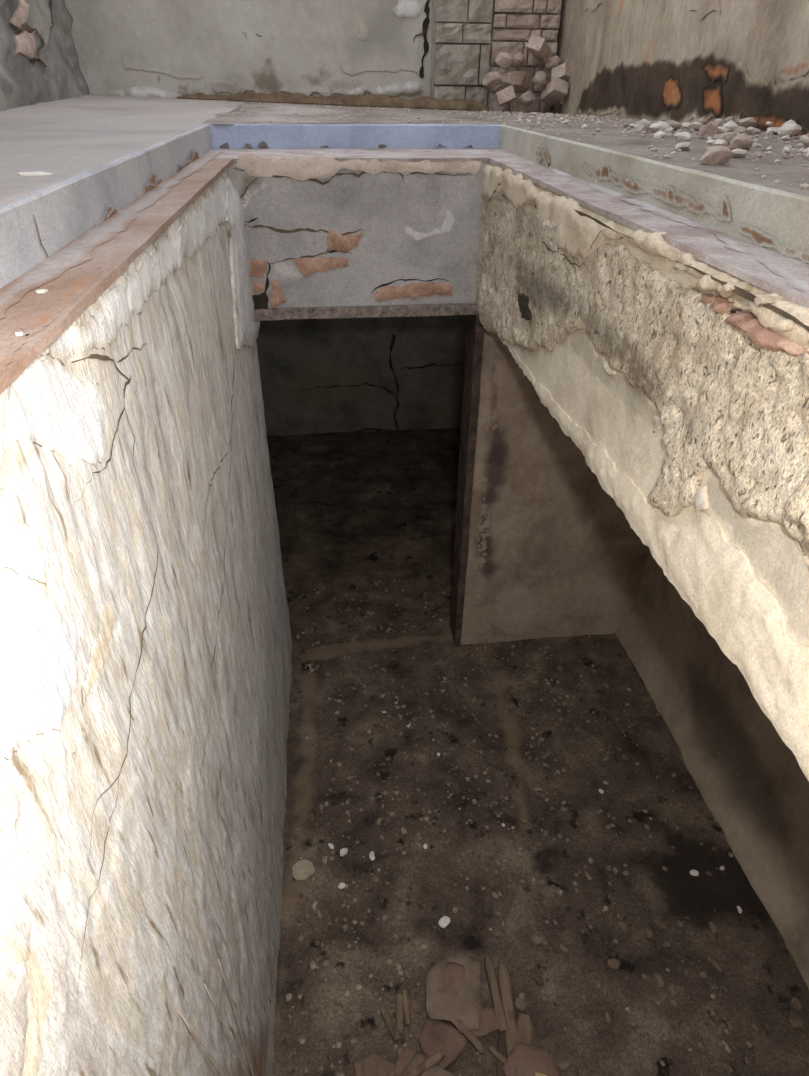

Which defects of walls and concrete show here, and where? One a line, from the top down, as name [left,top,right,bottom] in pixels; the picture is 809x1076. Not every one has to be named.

flaking render [9,0,37,59]
crack [413,0,430,78]
corrosion [137,149,199,199]
corrosion [0,265,102,376]
crack [290,334,465,432]
leakage [468,349,541,640]
spalling [236,152,809,781]